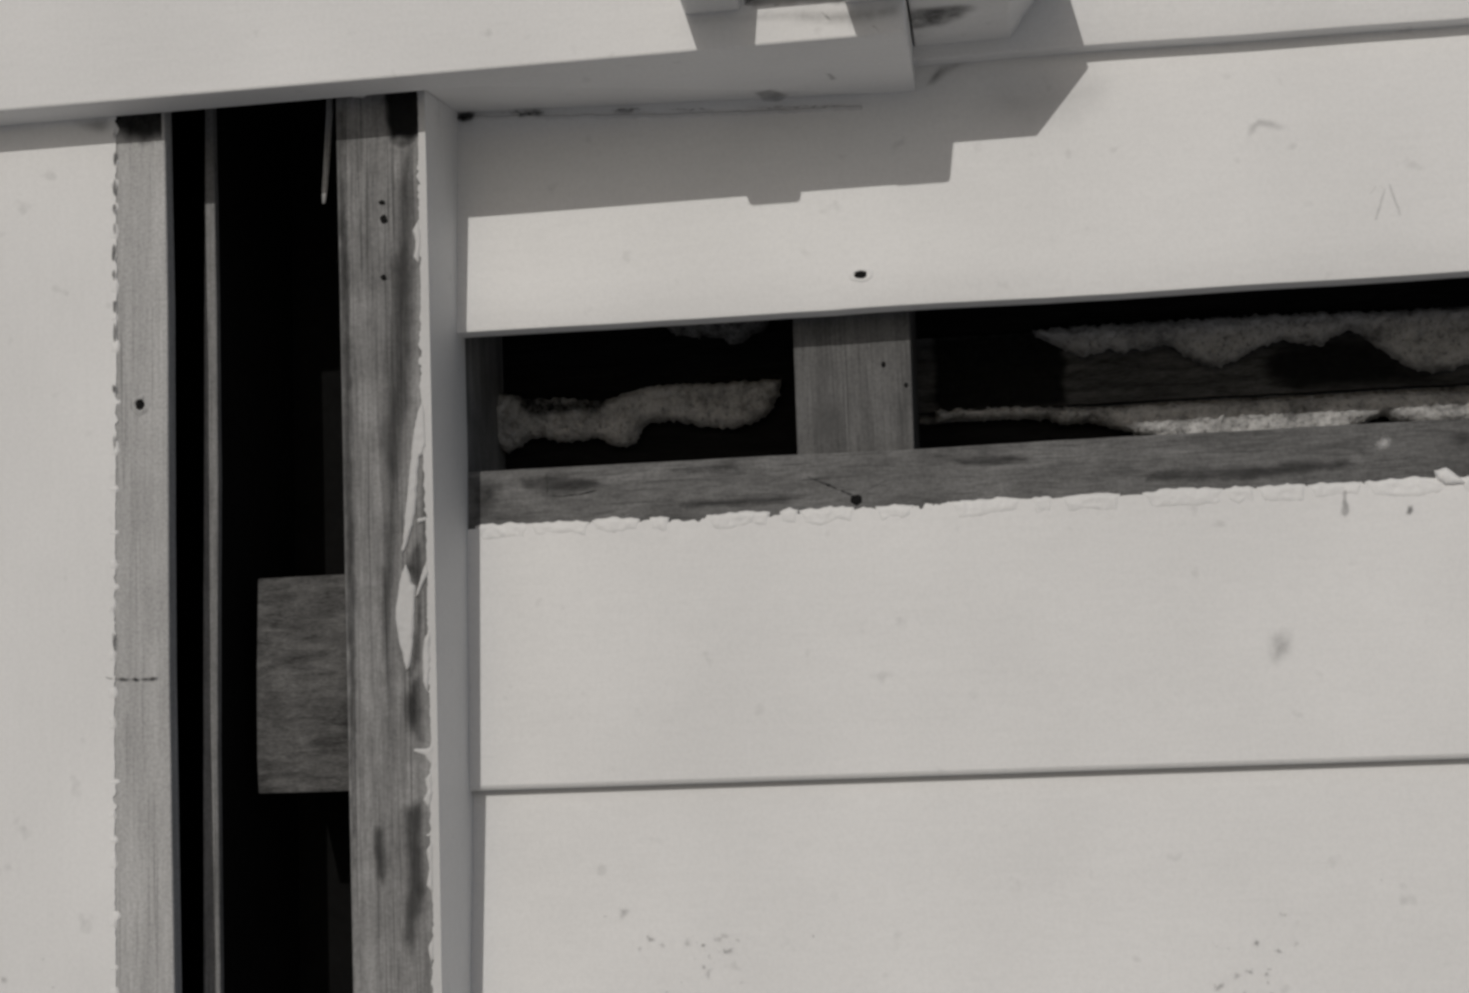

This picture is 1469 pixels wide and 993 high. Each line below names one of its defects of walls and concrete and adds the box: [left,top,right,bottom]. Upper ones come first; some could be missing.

peeling [110,154,120,354]
peeling [413,220,421,263]
peeling [475,516,669,539]
peeling [706,506,854,529]
peeling [875,504,913,521]
peeling [951,493,1120,518]
peeling [1142,476,1469,507]
peeling [395,402,431,692]
peeling [414,747,433,808]